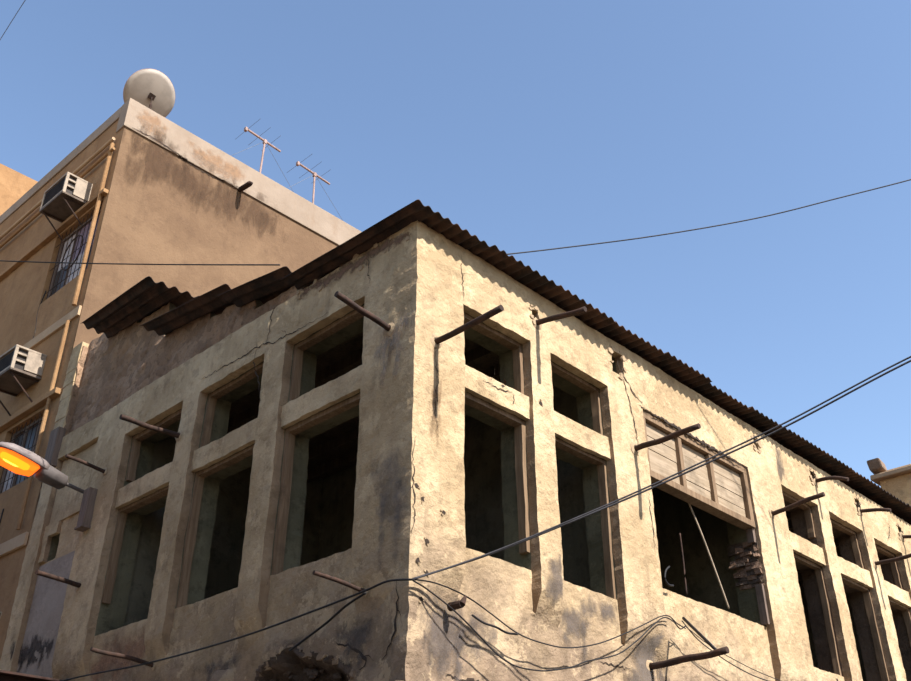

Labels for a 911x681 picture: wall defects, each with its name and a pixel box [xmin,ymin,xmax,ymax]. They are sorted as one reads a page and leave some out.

damp [134,135,268,230]
crack [617,362,748,468]
crack [404,446,418,535]
spalling [729,540,765,589]
damp [10,635,53,673]
spalling [252,645,356,681]